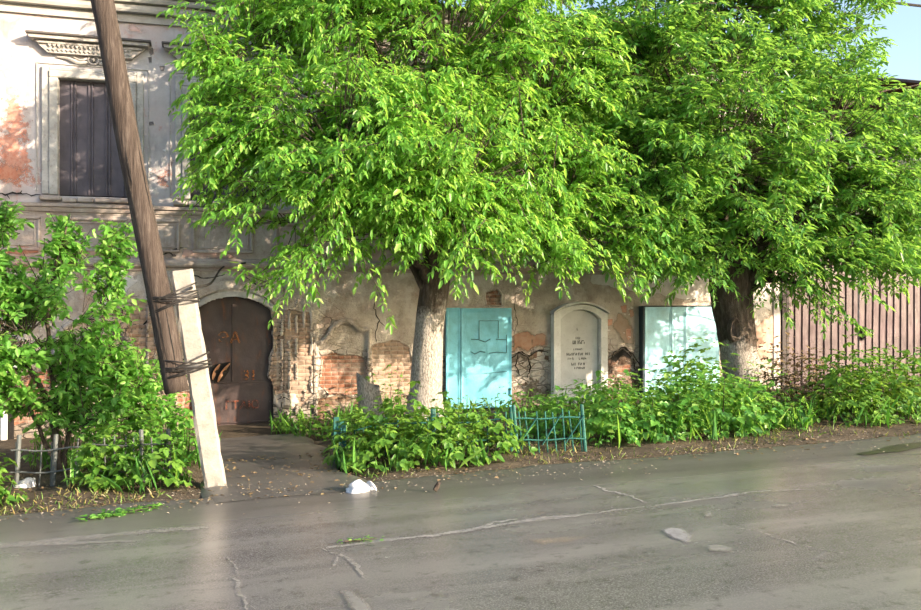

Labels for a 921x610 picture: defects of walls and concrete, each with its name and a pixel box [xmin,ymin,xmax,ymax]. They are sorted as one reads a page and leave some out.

peeling [0,87,41,190]
flaking render [484,288,504,307]
flaking render [267,308,412,420]
flaking render [512,349,551,406]
flaking render [608,328,639,399]
crack [465,519,517,531]
crack [652,489,799,507]